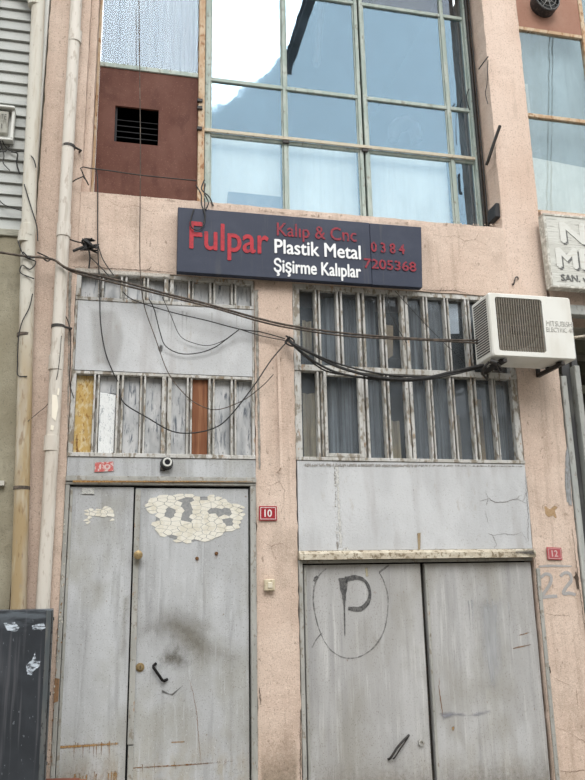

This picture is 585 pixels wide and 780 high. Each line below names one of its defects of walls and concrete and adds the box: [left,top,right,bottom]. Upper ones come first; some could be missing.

crack [485,476,585,624]
corrosion [60,741,117,754]